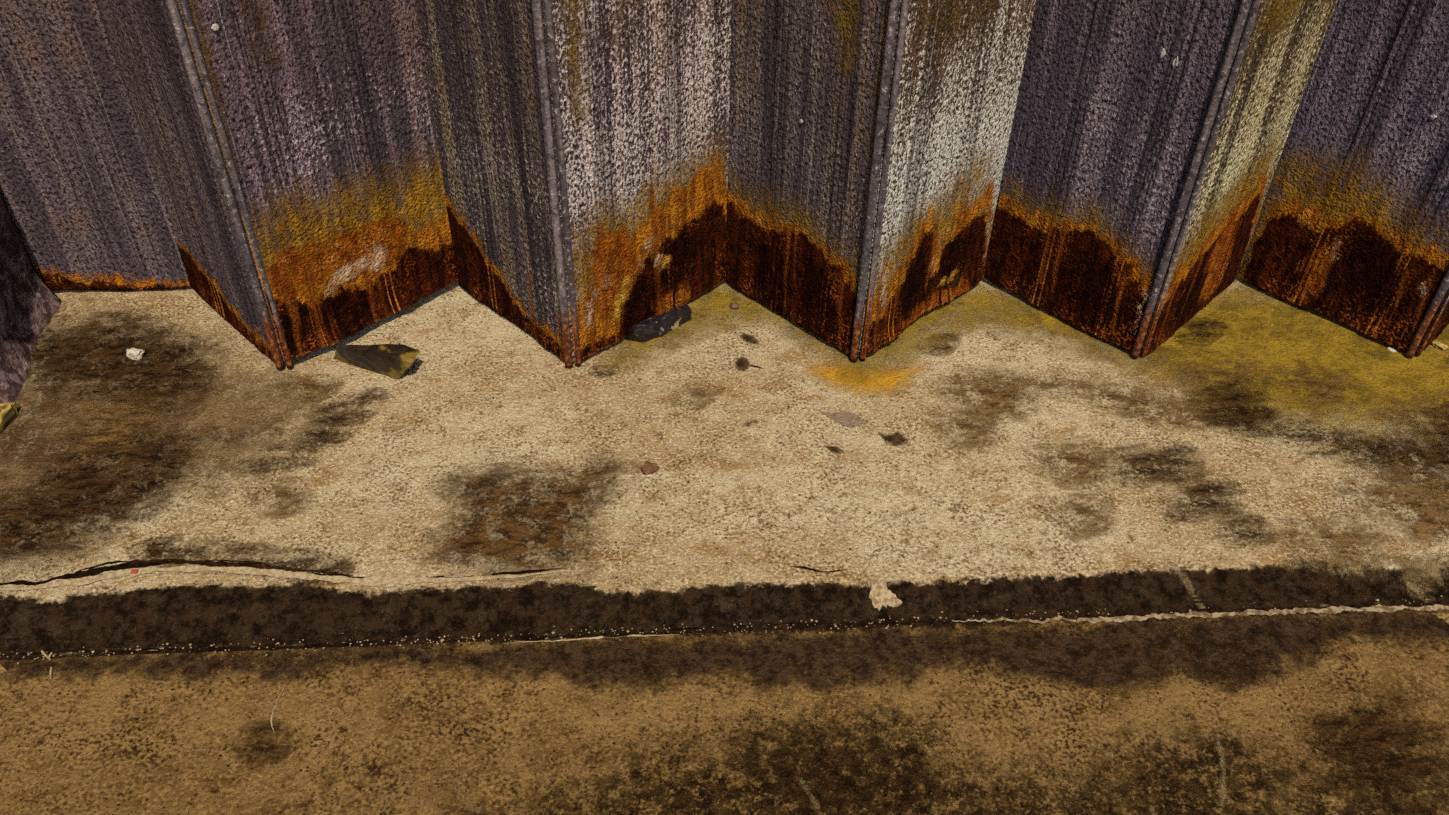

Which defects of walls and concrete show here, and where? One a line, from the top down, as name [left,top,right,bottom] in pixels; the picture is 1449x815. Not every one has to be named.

corrosion [31,143,1449,364]
water stain [0,313,384,562]
water stain [593,285,1449,541]
water stain [133,536,354,584]
crack [0,559,568,591]
water stain [431,462,622,570]
water stain [1040,442,1379,564]